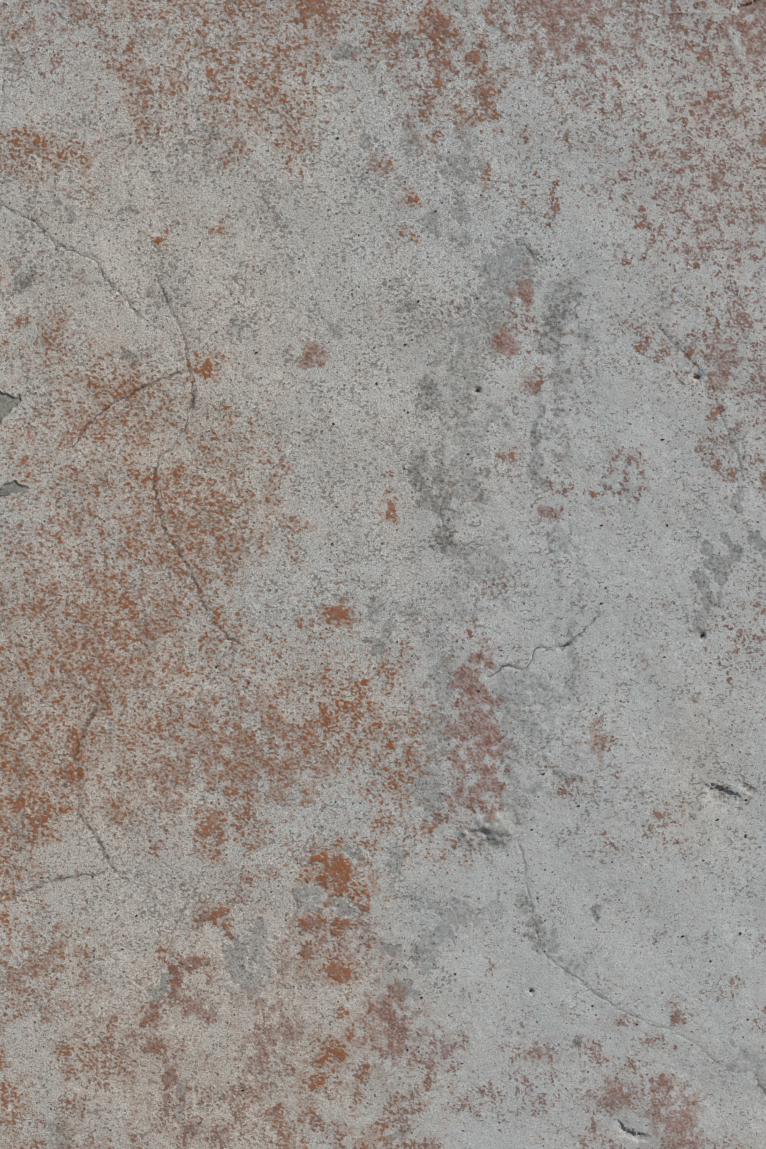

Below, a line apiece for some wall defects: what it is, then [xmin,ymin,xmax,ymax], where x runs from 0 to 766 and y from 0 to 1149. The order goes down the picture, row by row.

rust [0,0,348,182]
rust [523,171,564,227]
spalling [0,392,21,423]
spalling [0,481,28,496]
rust [0,306,473,1149]